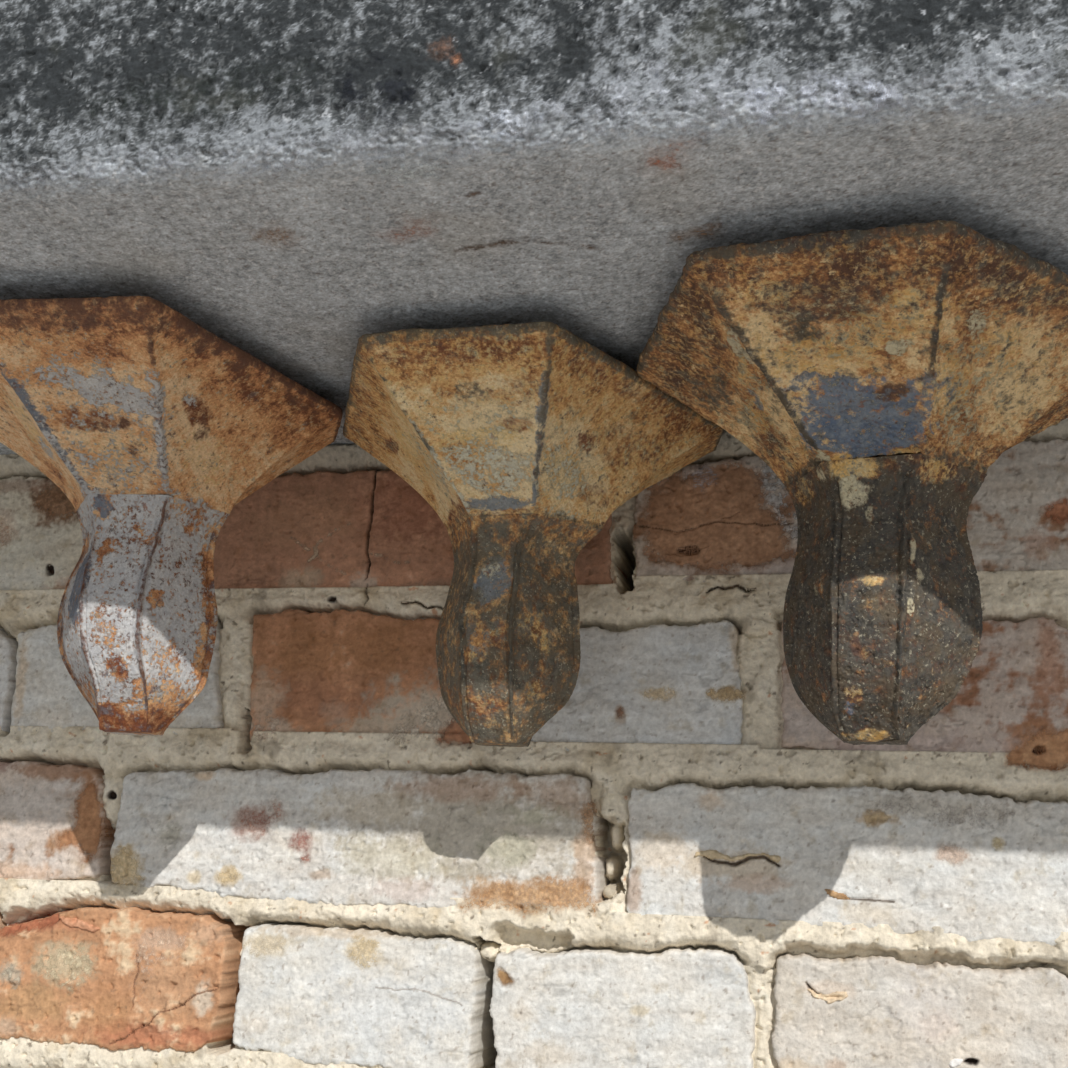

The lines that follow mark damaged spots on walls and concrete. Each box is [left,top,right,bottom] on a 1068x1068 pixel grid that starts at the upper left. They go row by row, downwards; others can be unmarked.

crack [365,471,377,604]
corrosion [707,687,743,701]
crack [110,989,217,1044]